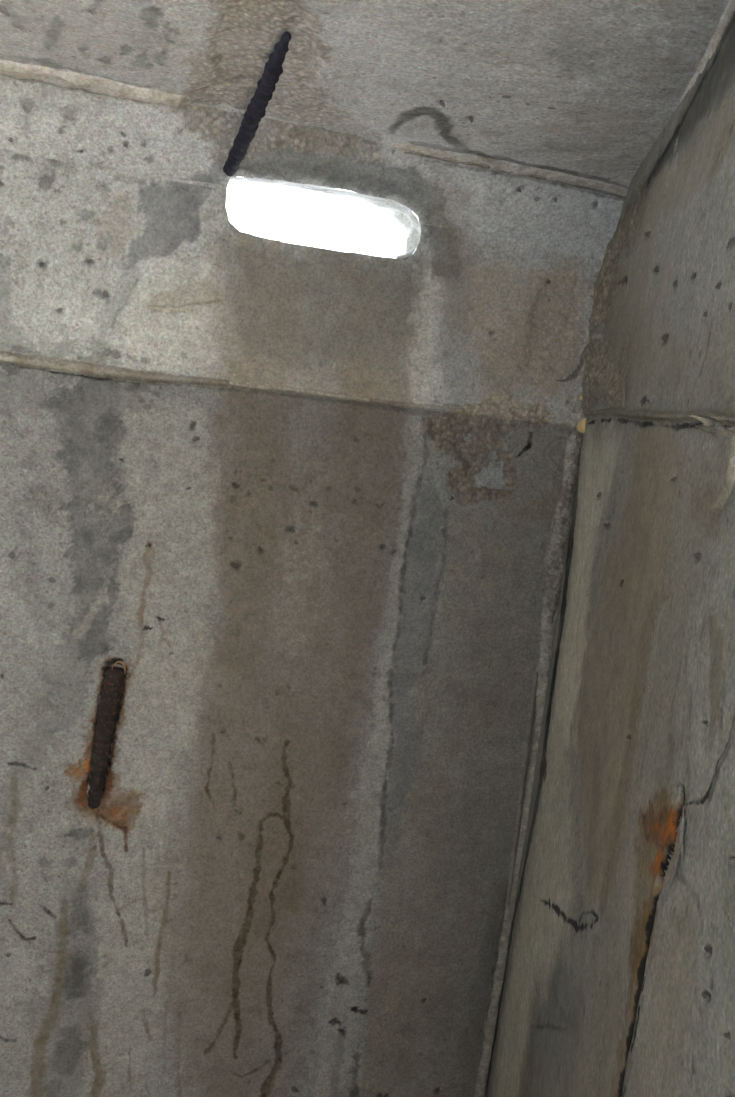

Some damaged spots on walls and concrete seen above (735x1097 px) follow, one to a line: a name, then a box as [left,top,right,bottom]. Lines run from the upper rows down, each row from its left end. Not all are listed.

corrosion [35,538,173,948]
leakage [0,150,600,1097]
spalling [419,253,591,514]
crack [484,416,735,1097]
leakage [490,422,735,1097]
leakage [520,23,735,410]